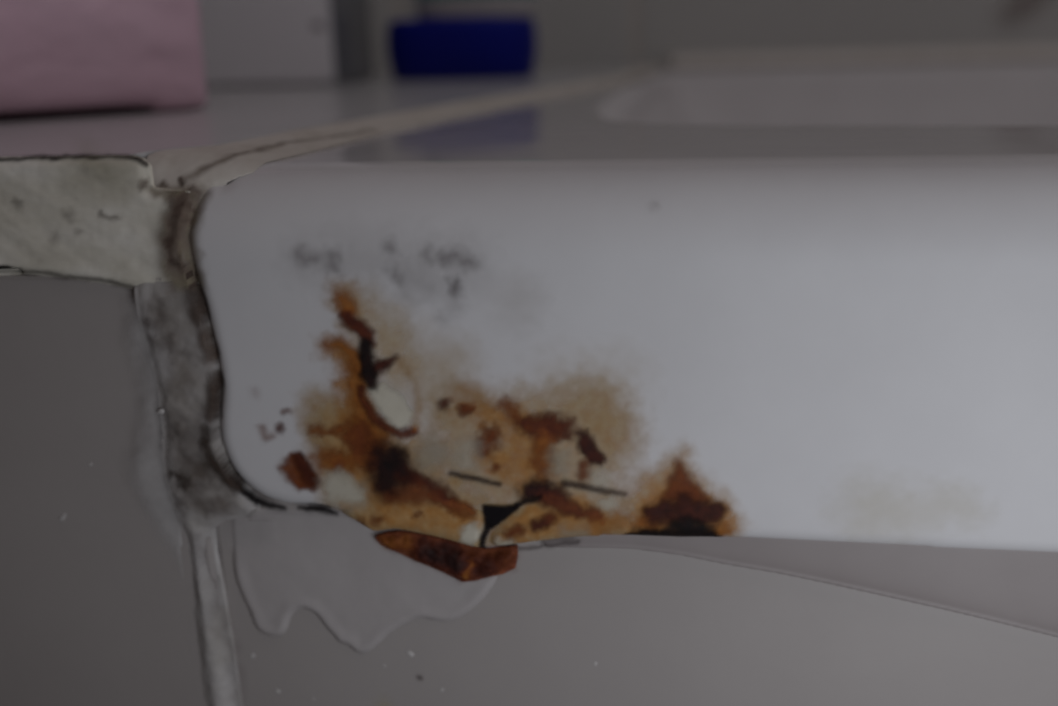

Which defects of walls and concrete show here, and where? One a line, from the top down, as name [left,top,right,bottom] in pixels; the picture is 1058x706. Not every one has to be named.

mould [141,177,246,493]
rust [280,290,738,582]